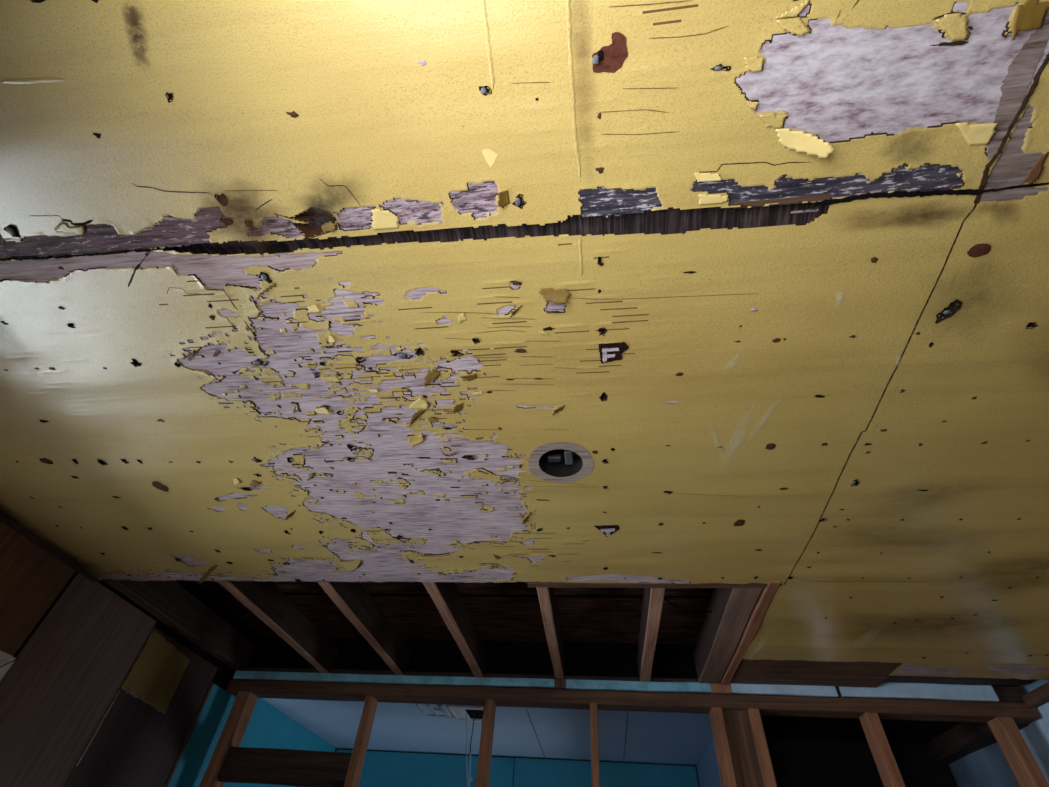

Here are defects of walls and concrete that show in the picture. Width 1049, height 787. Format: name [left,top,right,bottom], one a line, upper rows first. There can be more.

rust [592,32,628,73]
crack [650,26,727,39]
peeling [736,0,1049,202]
spalling [482,148,498,167]
peeling [251,181,510,240]
peeling [579,187,662,217]
peeling [690,164,963,205]
crack [0,53,1049,585]
peeling [539,288,571,312]
peeling [0,207,544,584]